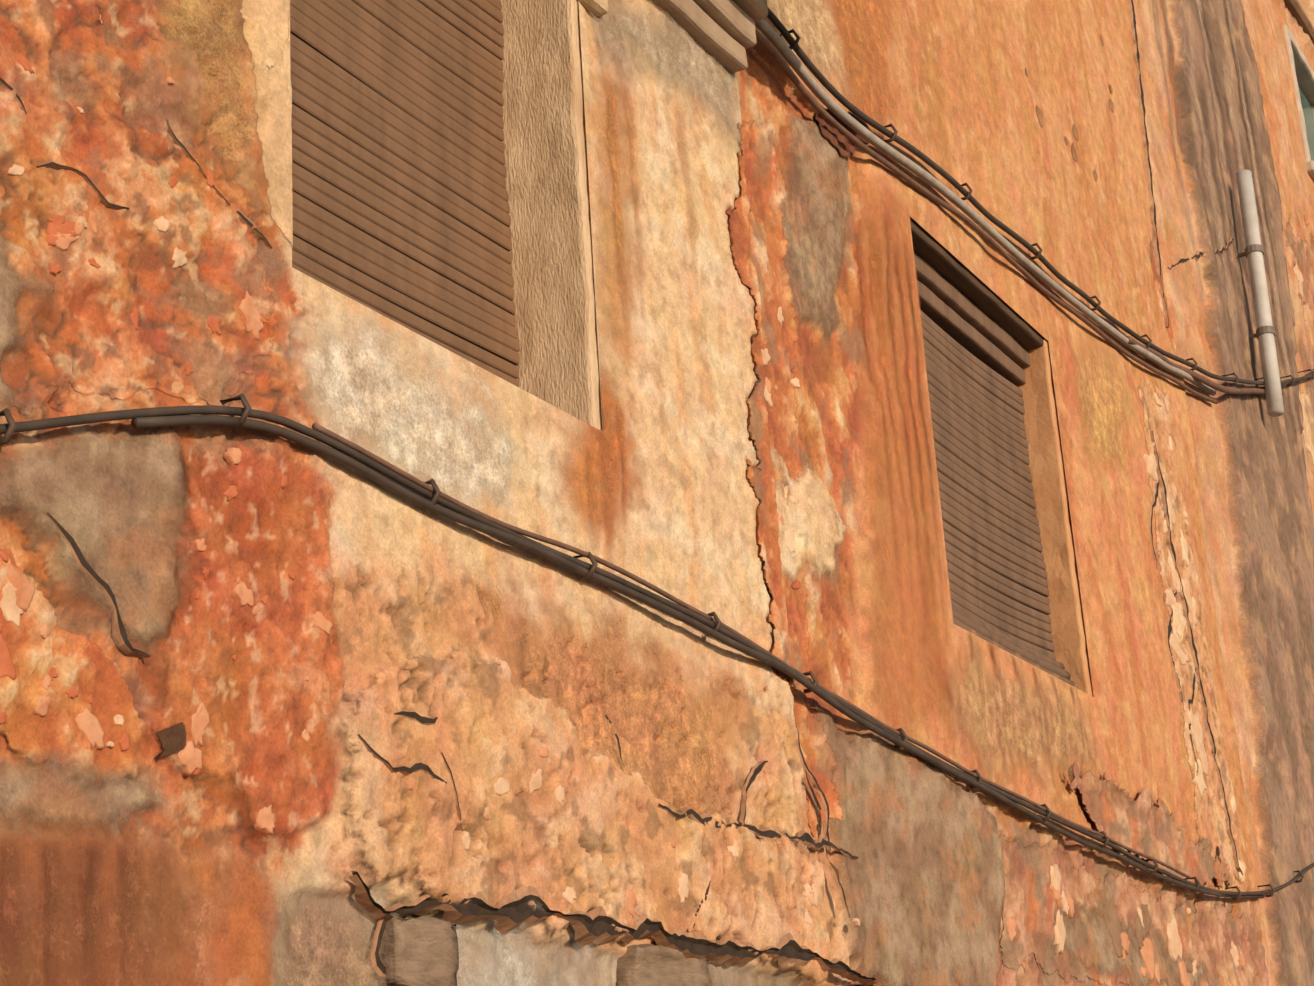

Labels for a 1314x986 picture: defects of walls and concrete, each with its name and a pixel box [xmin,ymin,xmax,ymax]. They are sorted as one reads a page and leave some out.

flaking render [0,0,275,415]
peeling [239,0,293,246]
crack [1128,0,1237,328]
damp [1154,0,1284,327]
peeling [0,549,163,778]
flaking render [341,120,846,986]
crack [348,871,876,986]
crack [658,726,859,918]
flaking render [999,380,1262,986]
crack [1149,430,1243,875]